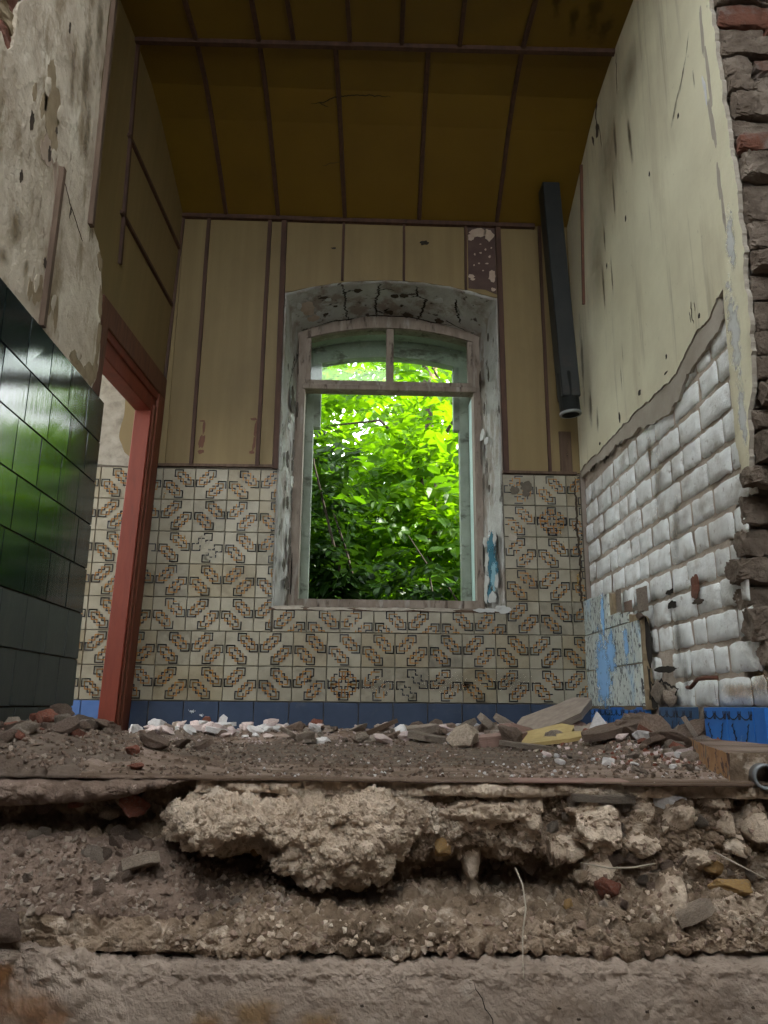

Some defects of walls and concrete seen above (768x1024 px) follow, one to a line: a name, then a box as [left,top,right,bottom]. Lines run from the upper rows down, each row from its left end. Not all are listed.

flaking render [0,0,110,388]
peeling [467,227,497,294]
crack [290,285,465,426]
flaking render [585,0,768,710]
peeling [473,531,511,614]